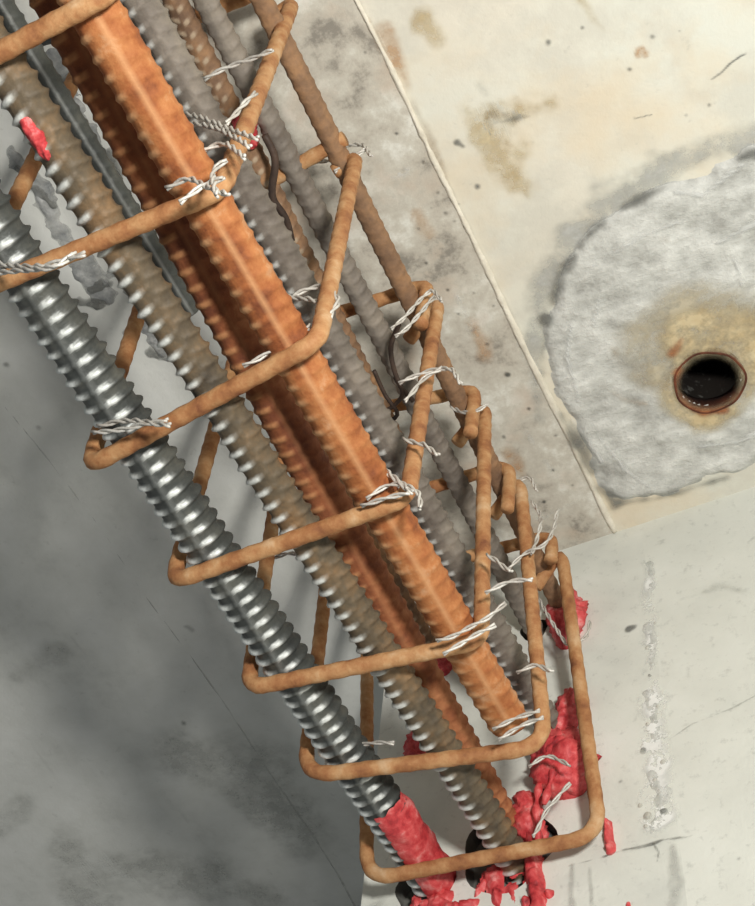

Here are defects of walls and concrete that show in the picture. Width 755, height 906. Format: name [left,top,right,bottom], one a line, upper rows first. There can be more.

rust [388,46,401,68]
water stain [624,192,651,208]
rust [628,289,755,430]
water stain [570,431,595,472]
water stain [606,491,626,507]